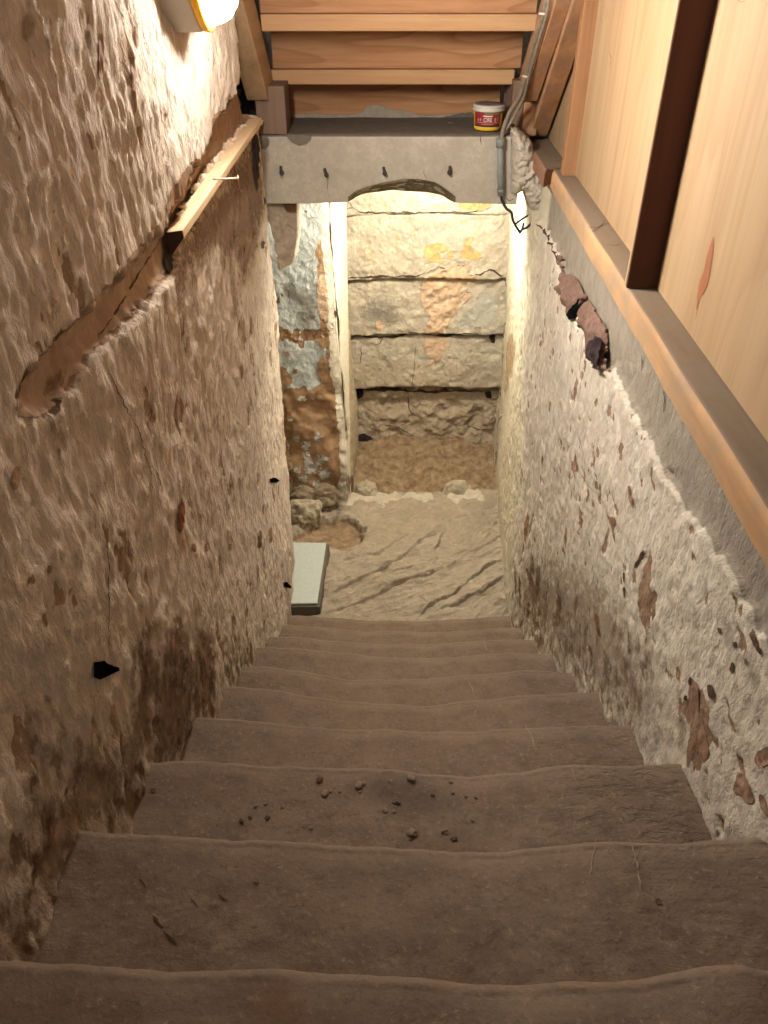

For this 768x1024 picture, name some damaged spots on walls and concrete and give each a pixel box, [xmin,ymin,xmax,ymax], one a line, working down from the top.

flaking render [212,88,243,141]
flaking render [17,159,202,418]
flaking render [554,246,610,371]
peeling [279,274,341,488]
leakage [514,555,540,620]
leakage [585,614,648,712]
leakage [37,617,216,879]
peeling [733,772,768,815]
peeling [754,747,768,766]